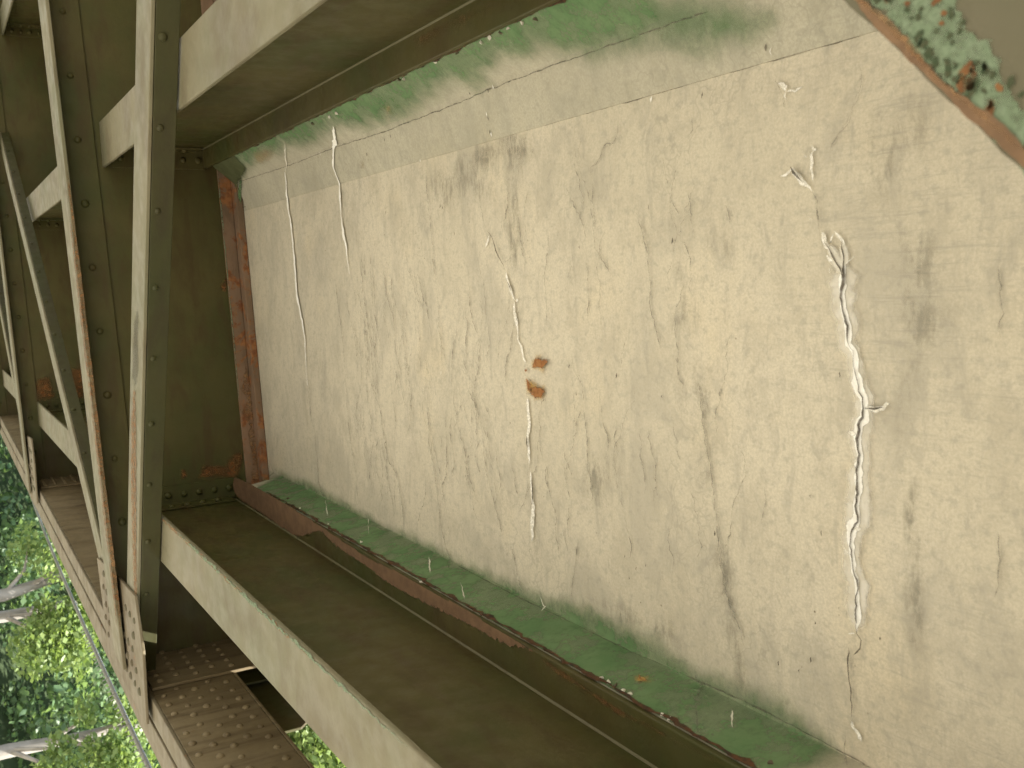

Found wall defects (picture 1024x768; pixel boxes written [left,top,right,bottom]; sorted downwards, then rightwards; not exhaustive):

rust [856,0,1024,168]
crack [284,148,308,386]
crack [332,127,617,595]
rust [525,358,547,398]
crack [782,146,889,745]
rust [161,518,402,743]